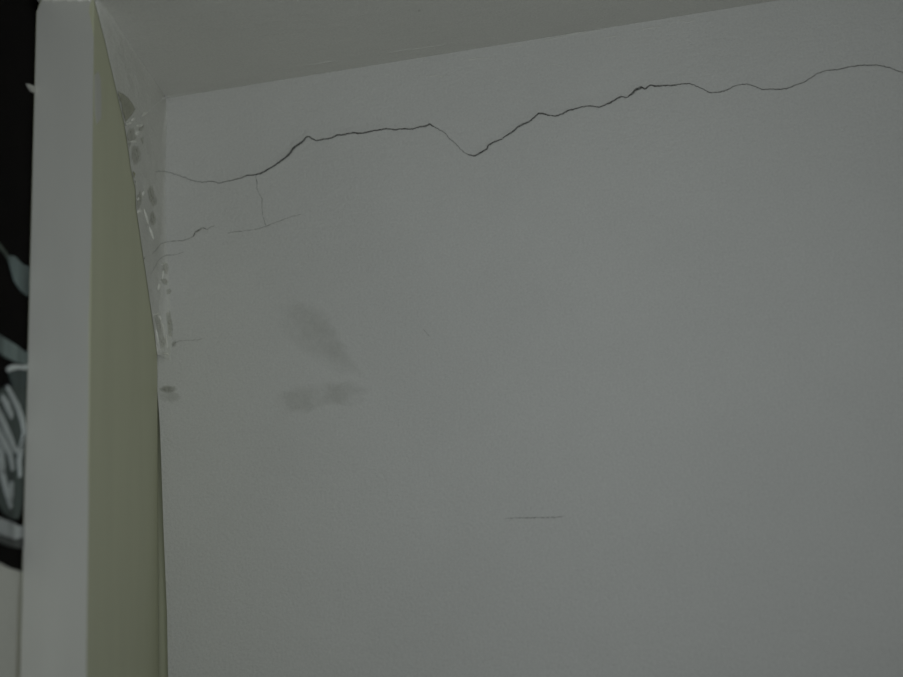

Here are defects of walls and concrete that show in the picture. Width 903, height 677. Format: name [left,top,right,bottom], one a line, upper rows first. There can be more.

crack [165,57,903,183]